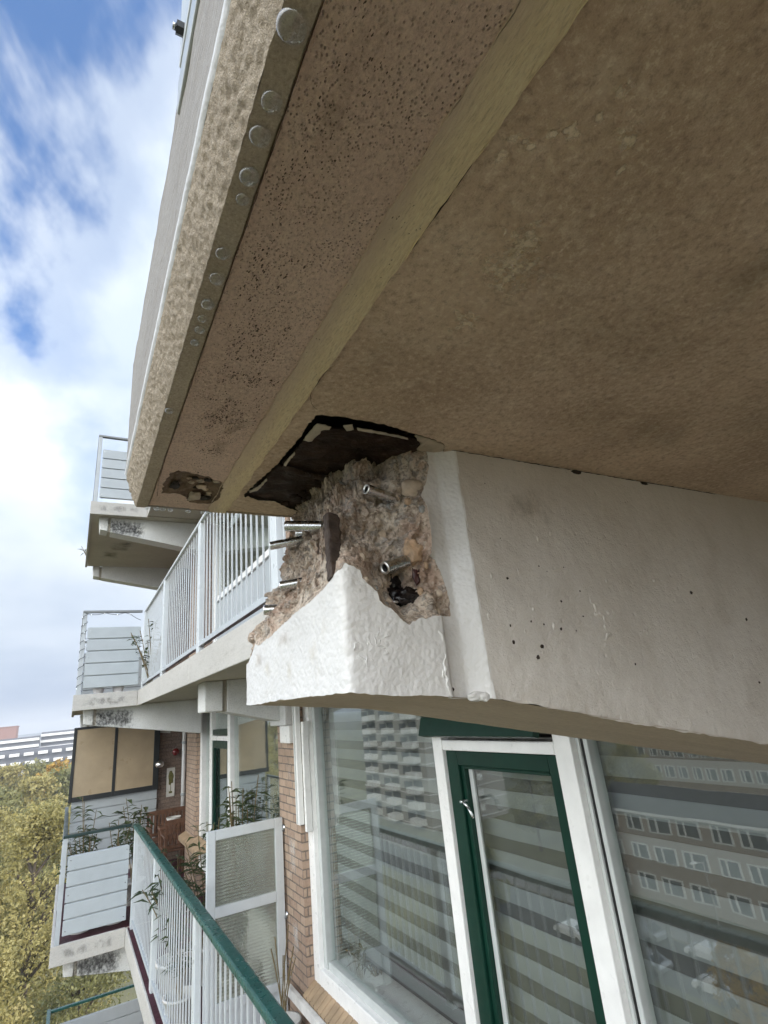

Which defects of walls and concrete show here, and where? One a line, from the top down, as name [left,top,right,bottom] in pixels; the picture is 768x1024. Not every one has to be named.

spalling [162,53,451,663]
corrosion [323,512,342,582]